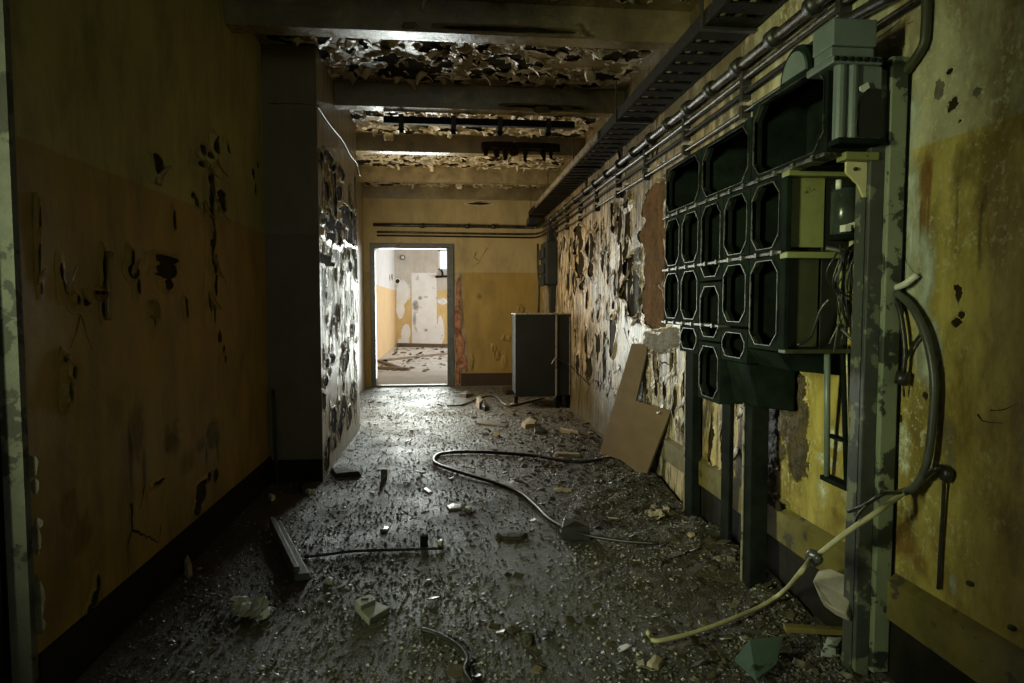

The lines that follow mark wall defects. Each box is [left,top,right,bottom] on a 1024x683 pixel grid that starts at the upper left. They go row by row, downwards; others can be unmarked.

peeling [263,0,654,91]
flaking render [933,65,986,125]
peeling [189,127,231,240]
peeling [145,249,182,295]
peeling [318,103,600,474]
flaking render [559,118,685,442]
flaking render [948,281,967,331]
peeling [769,371,812,501]
crack [128,485,161,544]